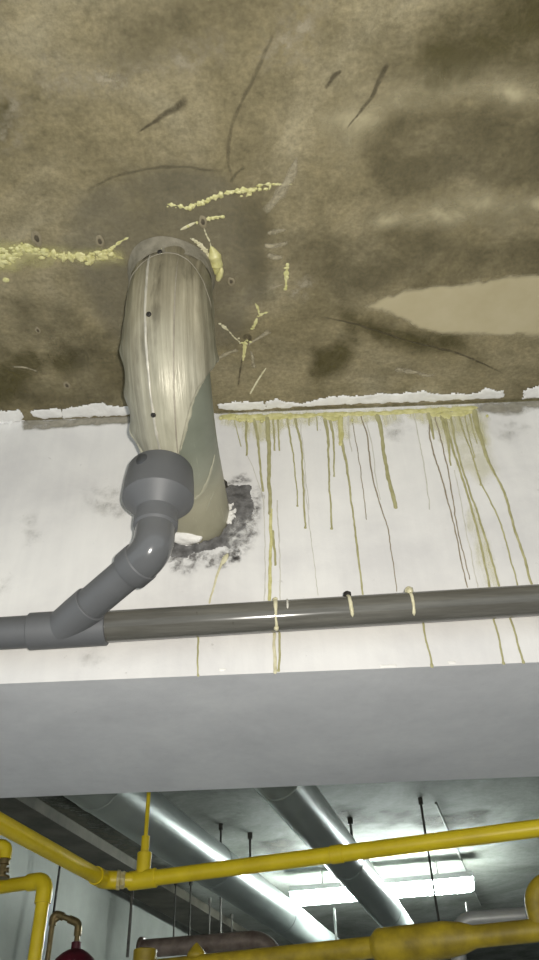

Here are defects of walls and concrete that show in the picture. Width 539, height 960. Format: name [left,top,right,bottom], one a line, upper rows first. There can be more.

leakage [325,0,539,147]
leakage [374,194,539,227]
peeling [368,275,539,336]
leakage [348,315,460,348]
leakage [311,344,350,377]
leakage [0,353,99,402]
peeling [0,402,130,429]
peeling [217,386,539,414]
leakage [219,406,533,674]